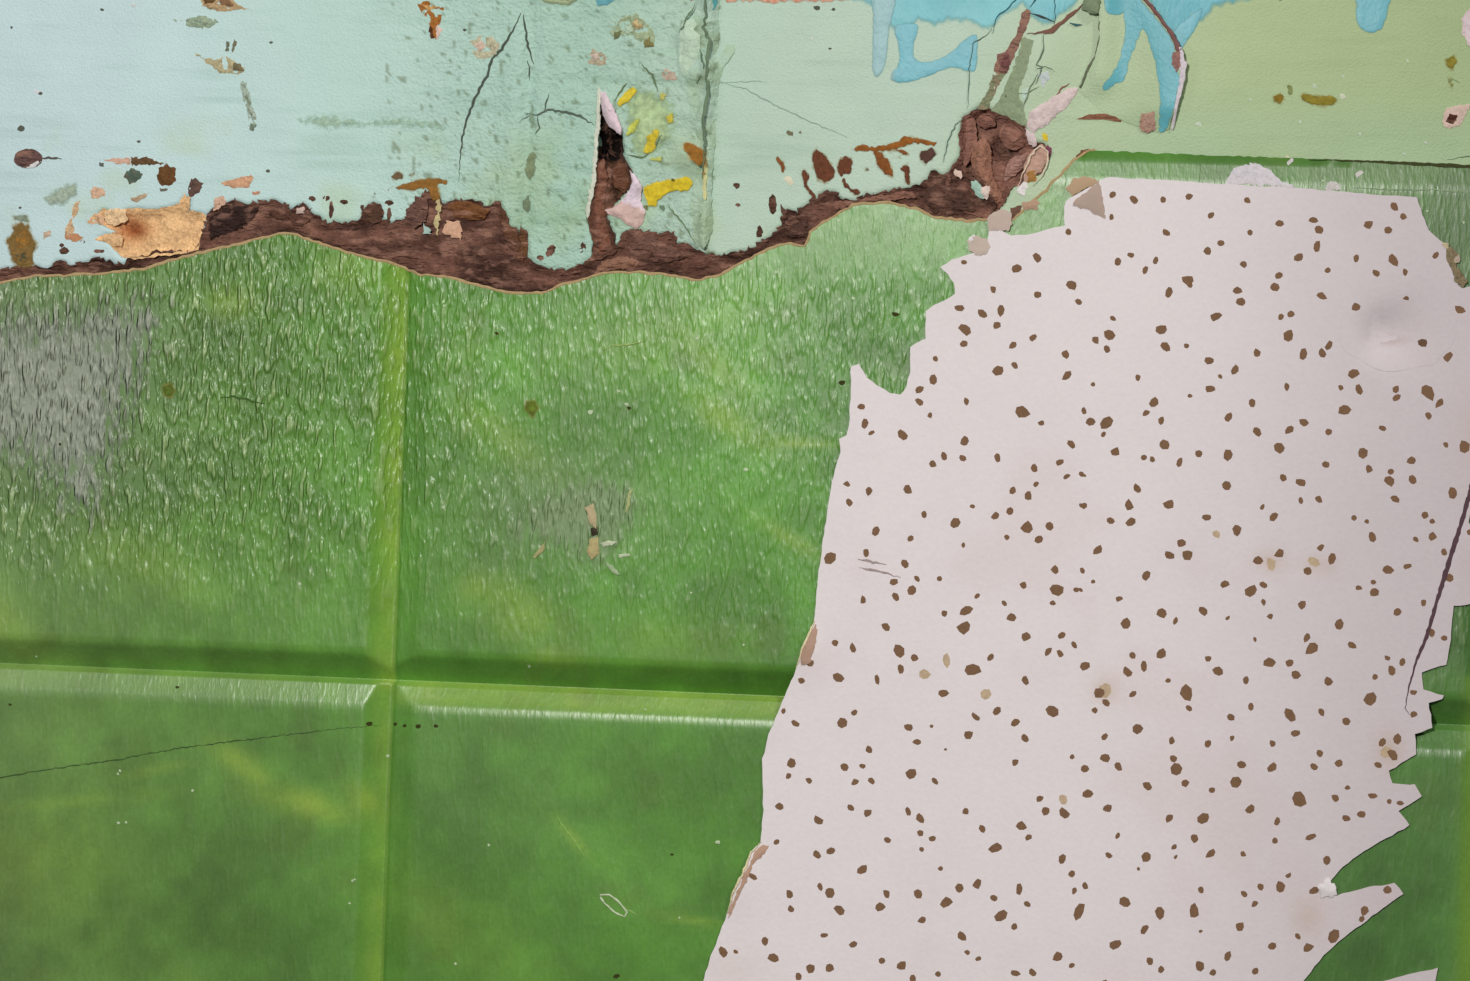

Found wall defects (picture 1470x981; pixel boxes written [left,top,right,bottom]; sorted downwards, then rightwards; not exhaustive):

crack [459,13,662,177]
spalling [0,0,1187,292]
spalling [1461,9,1470,46]